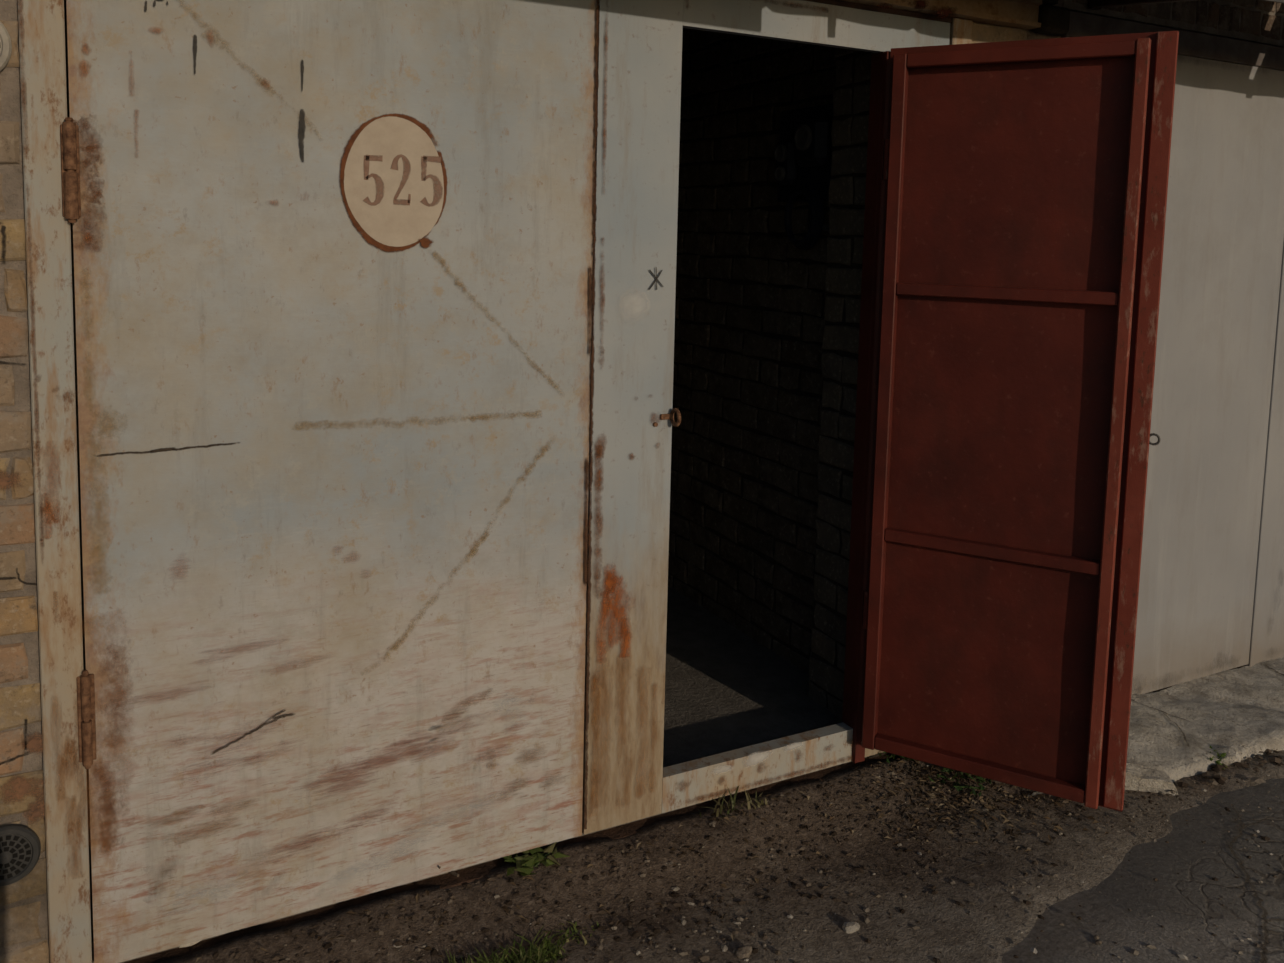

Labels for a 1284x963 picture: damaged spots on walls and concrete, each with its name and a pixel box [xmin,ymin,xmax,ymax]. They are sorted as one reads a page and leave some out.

corrosion [584,0,631,830]